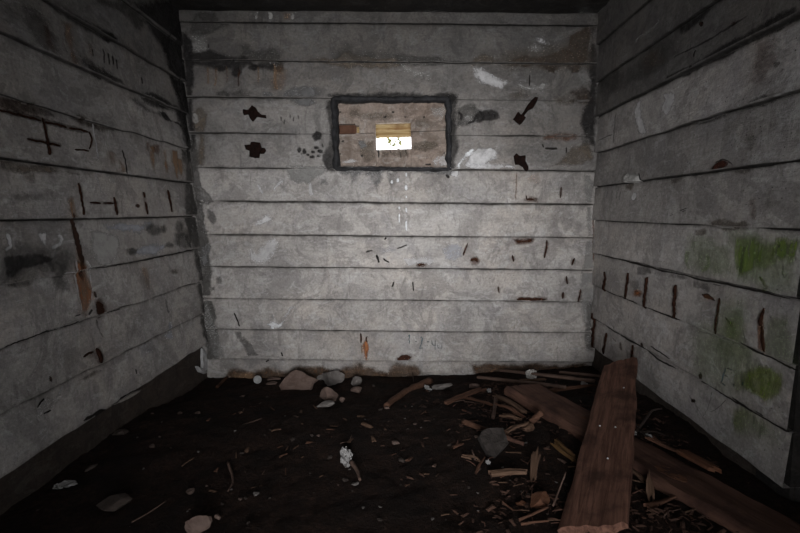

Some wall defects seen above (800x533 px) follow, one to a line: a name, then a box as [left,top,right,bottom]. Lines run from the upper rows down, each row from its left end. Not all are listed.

water stain [474,54,506,88]
water stain [298,92,423,174]
water stain [417,93,512,177]
water stain [4,233,66,289]
corrosion [69,199,93,308]
water stain [227,364,420,379]
water stain [473,363,588,374]